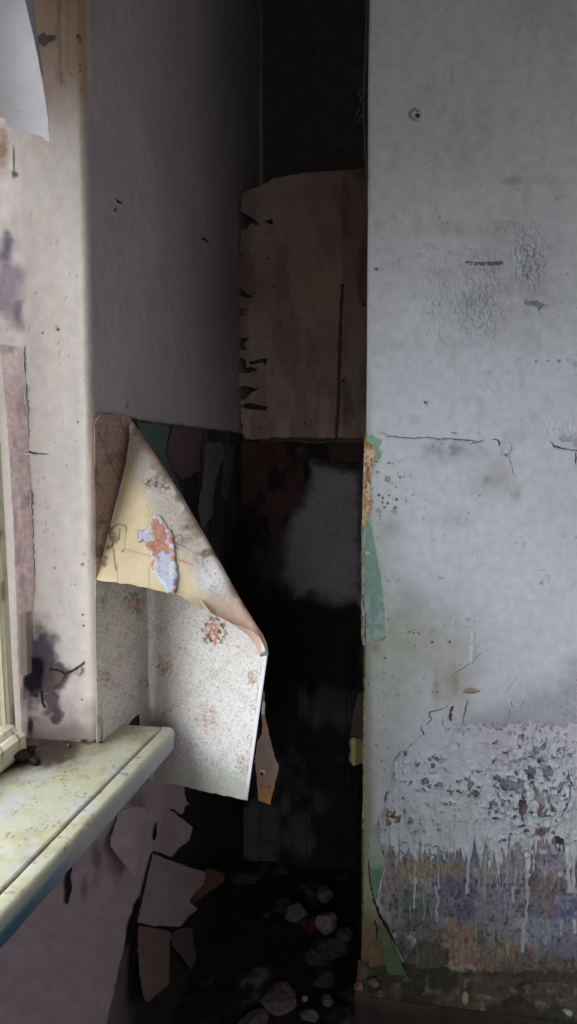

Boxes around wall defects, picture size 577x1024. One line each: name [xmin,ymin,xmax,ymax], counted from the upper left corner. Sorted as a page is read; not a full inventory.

crack [378,431,516,477]
crack [549,433,577,465]
peeling [81,414,268,800]
damp [22,633,85,723]
peeling [379,721,577,984]